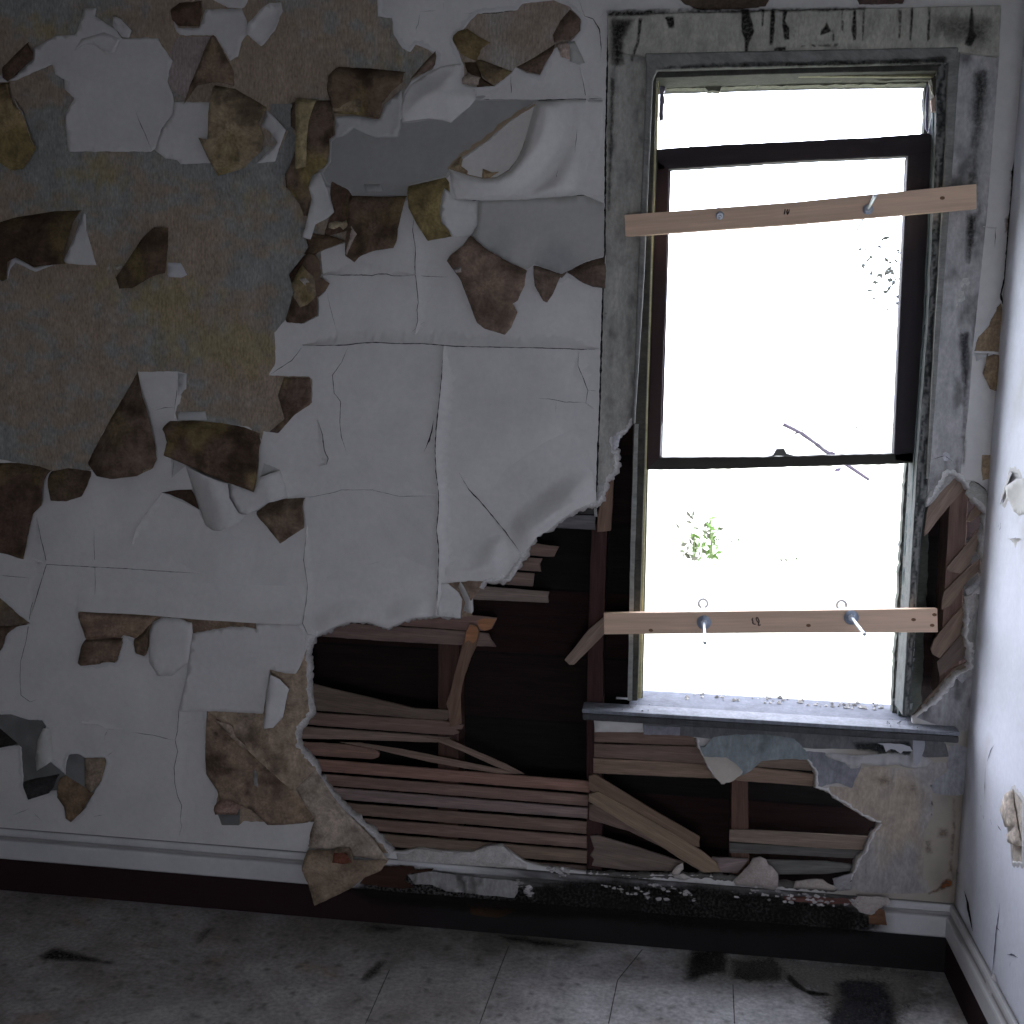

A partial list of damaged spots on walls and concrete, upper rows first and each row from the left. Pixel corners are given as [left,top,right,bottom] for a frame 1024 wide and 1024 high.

crack [454,7,608,257]
damp [608,10,674,65]
damp [670,8,947,68]
peeling [934,64,947,188]
damp [974,74,986,134]
damp [968,215,976,258]
crack [276,218,604,616]
flaking render [479,418,633,589]
peeling [892,213,988,731]
damp [961,332,969,388]
flaking render [295,613,534,898]
peeling [586,734,947,925]